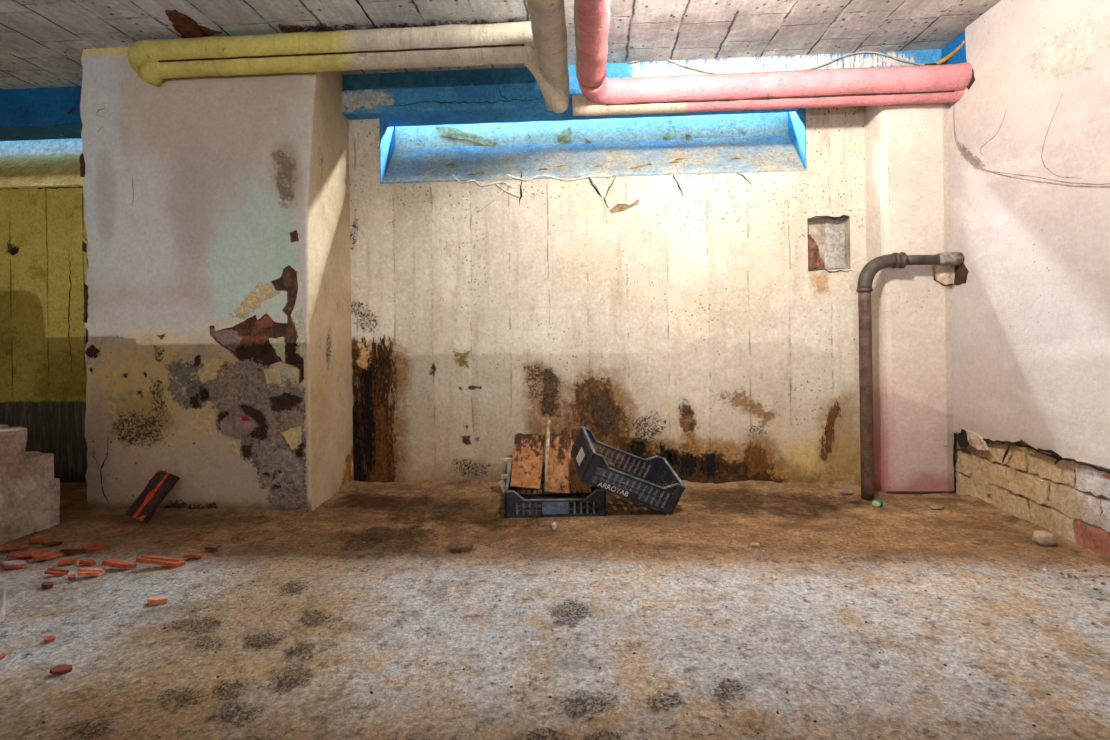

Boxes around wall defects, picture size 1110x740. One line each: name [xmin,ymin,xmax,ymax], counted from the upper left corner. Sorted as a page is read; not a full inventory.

crack [68,234,88,369]
flaking render [112,265,307,510]
flaking render [955,429,1110,557]